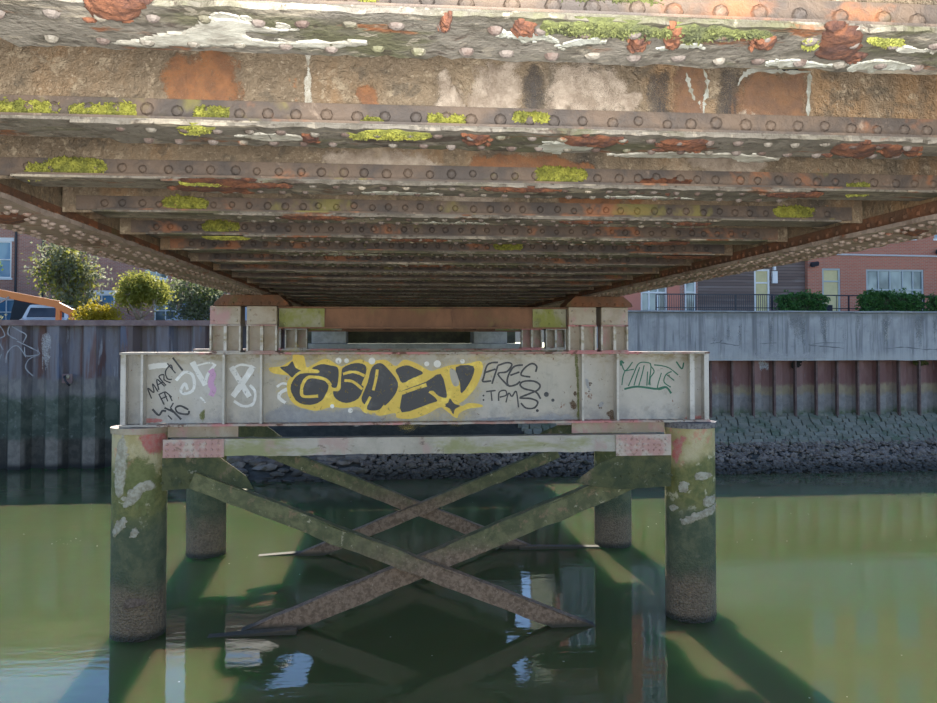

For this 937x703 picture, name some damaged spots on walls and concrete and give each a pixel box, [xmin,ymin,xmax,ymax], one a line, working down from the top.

rust [82,0,153,23]
peeling [112,12,368,50]
peeling [495,29,607,51]
peeling [656,43,706,51]
rust [814,20,868,65]
peeling [765,59,833,68]
peeling [847,45,937,73]
rust [821,140,923,160]
peeling [112,435,156,538]
peeling [678,472,713,493]
peeling [669,494,716,525]